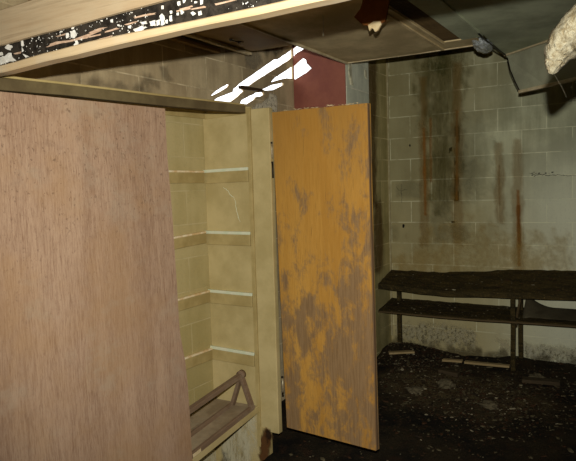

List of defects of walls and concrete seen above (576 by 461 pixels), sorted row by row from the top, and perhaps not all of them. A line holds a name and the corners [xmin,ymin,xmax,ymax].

peeling [99,0,203,33]
peeling [0,44,16,65]
leakage [523,345,576,364]